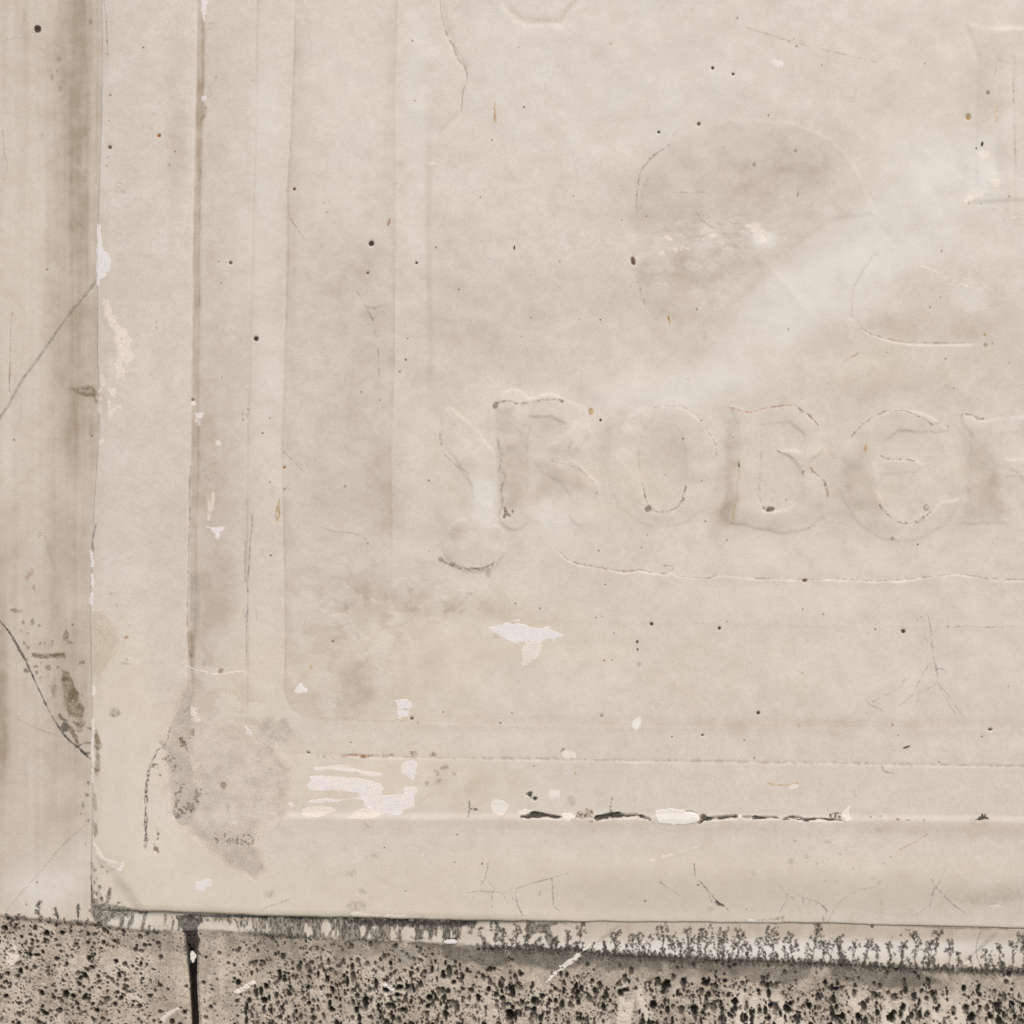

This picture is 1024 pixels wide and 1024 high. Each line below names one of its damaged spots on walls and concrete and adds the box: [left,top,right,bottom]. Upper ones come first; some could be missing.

peeling [96,224,111,286]
crack [0,621,91,760]
water stain [89,876,810,984]
water stain [829,965,941,989]